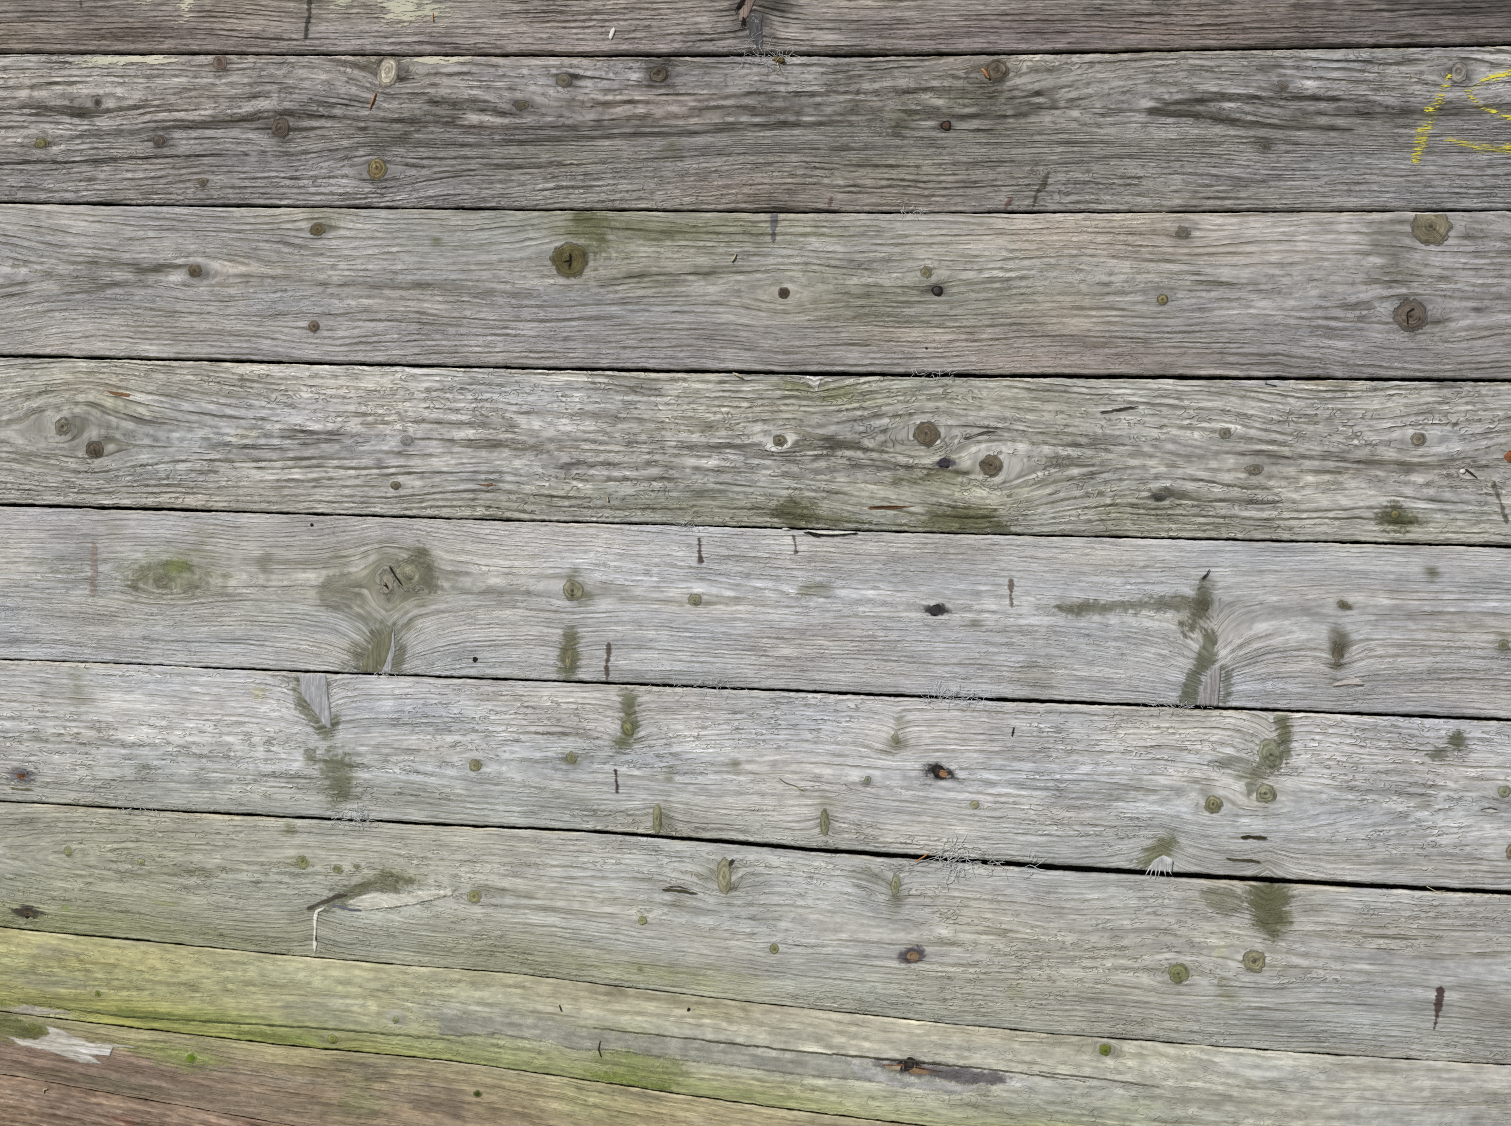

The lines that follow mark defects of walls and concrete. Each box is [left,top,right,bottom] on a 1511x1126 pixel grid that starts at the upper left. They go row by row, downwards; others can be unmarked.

damp [0,1005,67,1037]